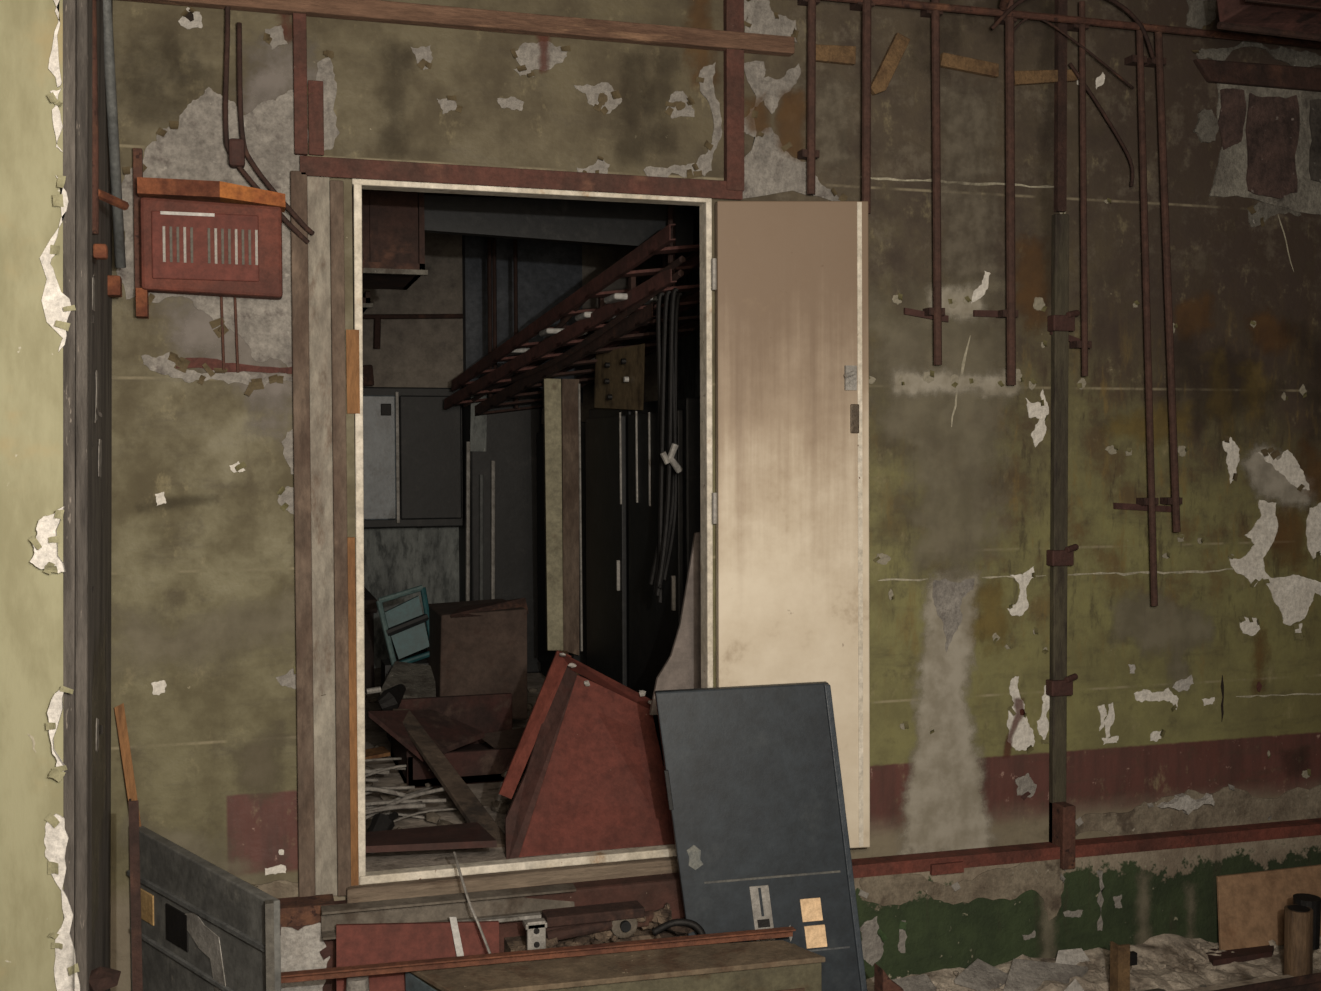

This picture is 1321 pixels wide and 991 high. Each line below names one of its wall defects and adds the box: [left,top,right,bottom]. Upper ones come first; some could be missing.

spalling [743,61,848,201]
damp [816,82,849,165]
spalling [40,175,76,352]
spalling [116,50,340,396]
spalling [29,506,65,574]
damp [869,82,1020,855]
peeling [996,369,1049,447]
peeling [1222,435,1321,641]
peeling [1007,676,1050,753]
spalling [1075,769,1321,836]
spalling [44,813,80,991]
flaking render [280,923,332,991]